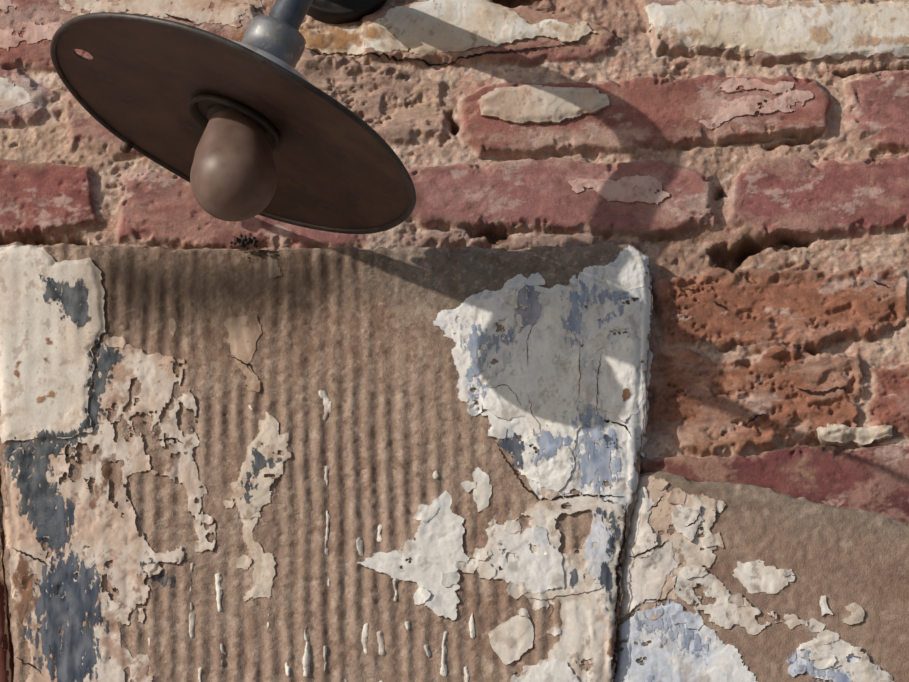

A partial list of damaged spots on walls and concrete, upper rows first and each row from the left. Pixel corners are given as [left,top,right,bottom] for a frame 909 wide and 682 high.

peeling [644,0,909,79]
peeling [0,77,35,113]
peeling [699,77,814,130]
spalling [466,219,517,246]
peeling [168,318,177,336]
peeling [224,314,262,393]
crack [489,384,540,436]
crack [576,341,632,437]
peeling [357,227,909,682]
peeling [0,336,216,682]
peeling [223,412,291,602]